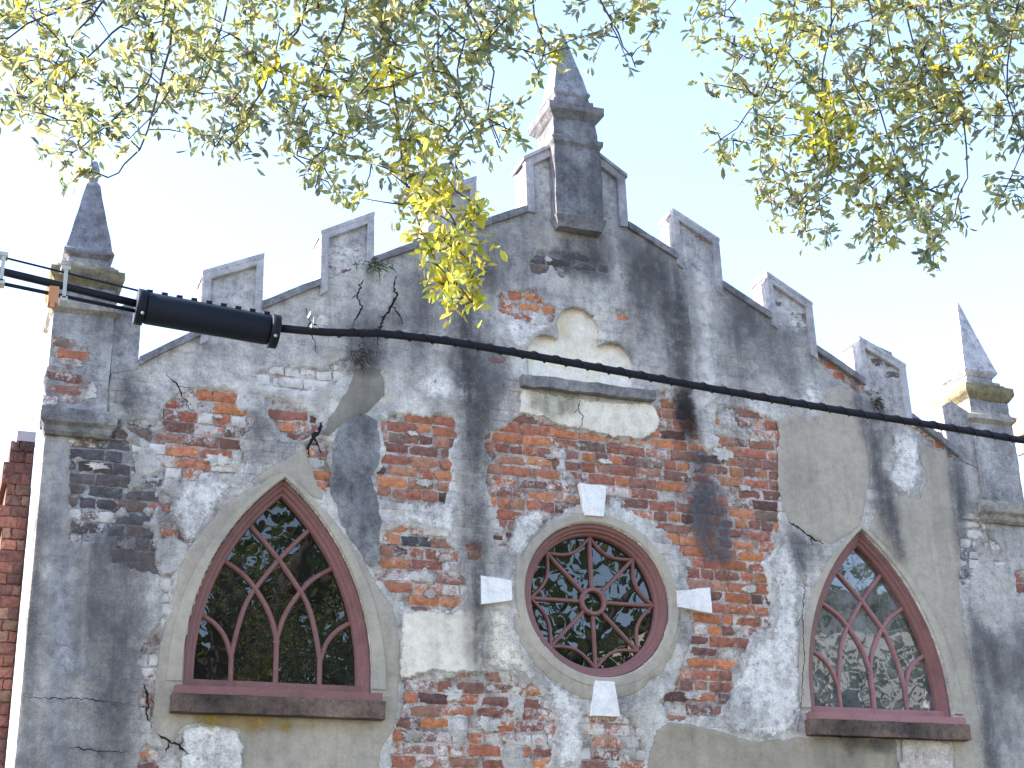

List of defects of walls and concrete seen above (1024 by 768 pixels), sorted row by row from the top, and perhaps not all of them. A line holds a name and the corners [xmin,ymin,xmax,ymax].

crack [351,276,403,348]
damp [624,242,690,391]
spalling [42,336,97,405]
crack [166,373,190,410]
spalling [373,414,457,509]
spalling [68,389,254,720]
spalling [373,526,482,614]
spalling [483,391,781,722]
crack [789,522,824,546]
crack [793,574,807,726]
crack [23,684,189,754]
spalling [389,672,557,768]